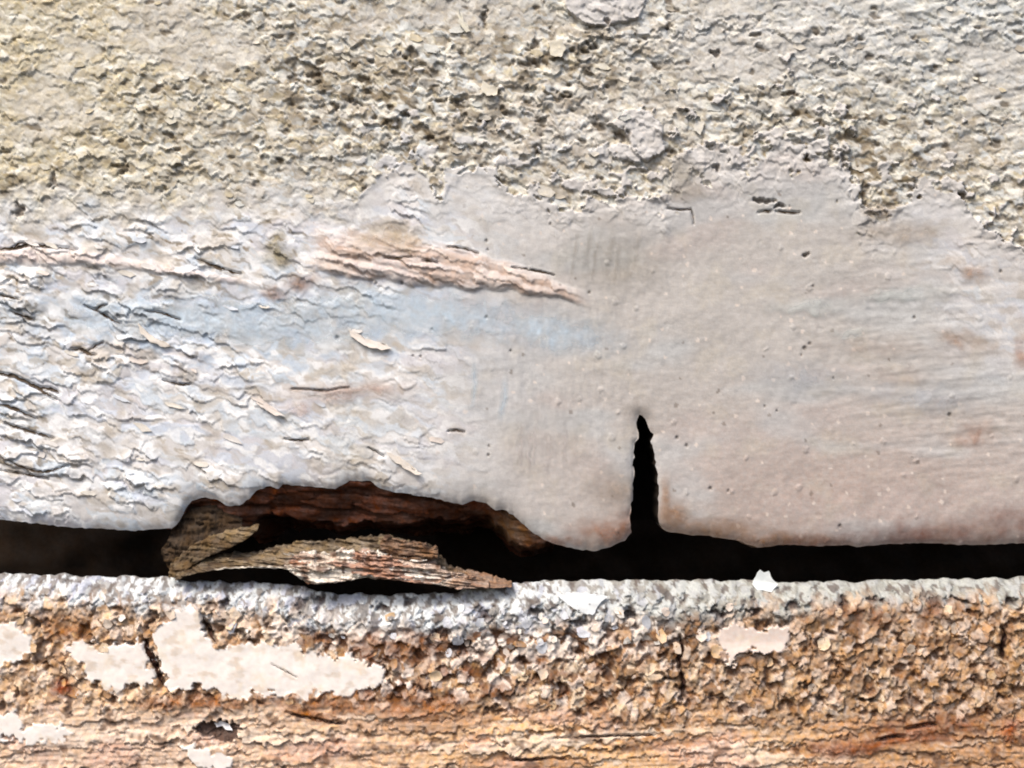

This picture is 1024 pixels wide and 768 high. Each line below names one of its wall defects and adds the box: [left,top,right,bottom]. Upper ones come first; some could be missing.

peeling [0,0,1024,590]
crack [0,404,54,439]
crack [0,415,1024,596]
peeling [0,570,1024,768]